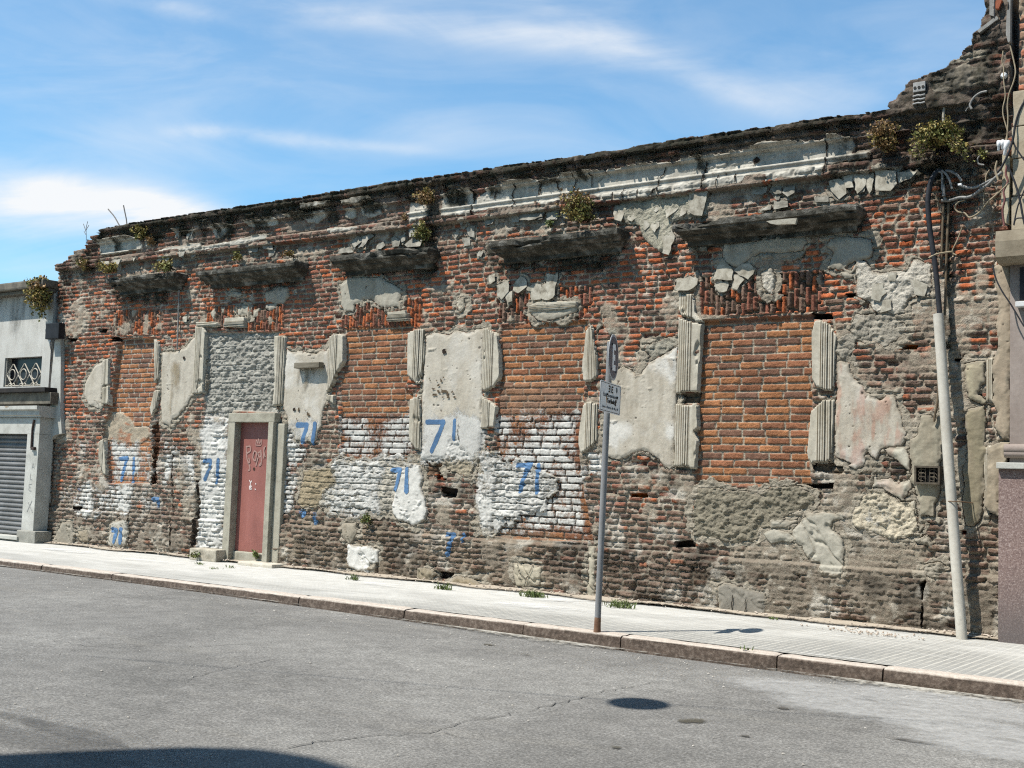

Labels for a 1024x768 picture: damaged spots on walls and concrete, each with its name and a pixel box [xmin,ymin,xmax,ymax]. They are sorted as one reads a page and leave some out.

peeling [93,133,941,550]
peeling [81,358,108,413]
peeling [61,439,154,519]